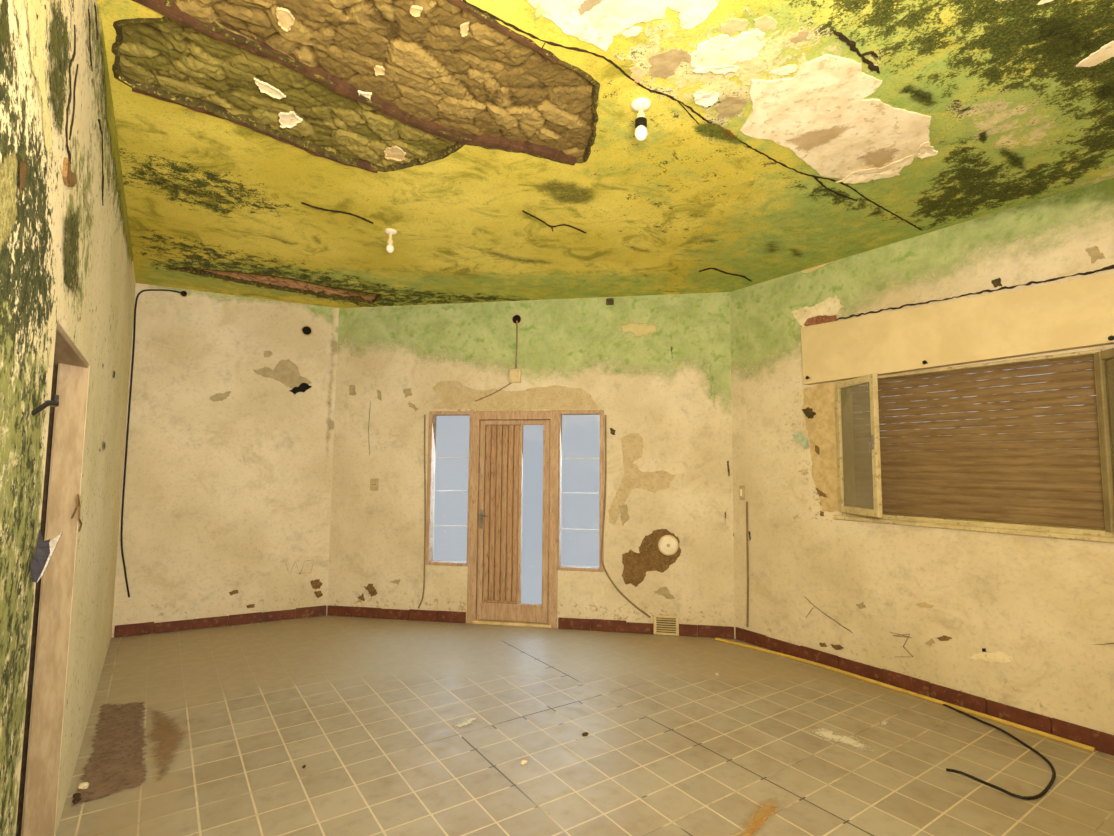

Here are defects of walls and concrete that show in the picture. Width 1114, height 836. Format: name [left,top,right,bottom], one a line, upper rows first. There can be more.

leakage [0,0,23,79]
mould [48,0,71,135]
crack [463,0,712,124]
peeling [527,0,719,51]
crack [833,30,880,74]
peeling [1076,41,1114,67]
peeling [694,54,938,184]
crack [737,138,923,231]
leakage [307,178,1114,401]
crack [837,265,1114,320]
spalling [622,529,681,587]
leakage [77,702,183,803]